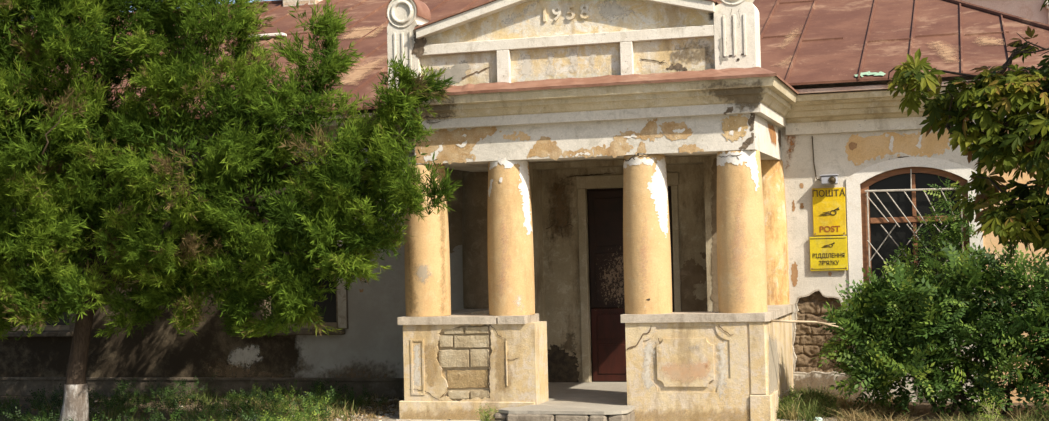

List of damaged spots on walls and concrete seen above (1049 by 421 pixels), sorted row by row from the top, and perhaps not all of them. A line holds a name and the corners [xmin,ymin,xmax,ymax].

peeling [845,129,950,166]
peeling [413,118,704,254]
peeling [680,106,759,312]
peeling [593,247,625,311]
peeling [230,345,262,366]
spalling [438,325,492,401]
spalling [791,262,853,375]